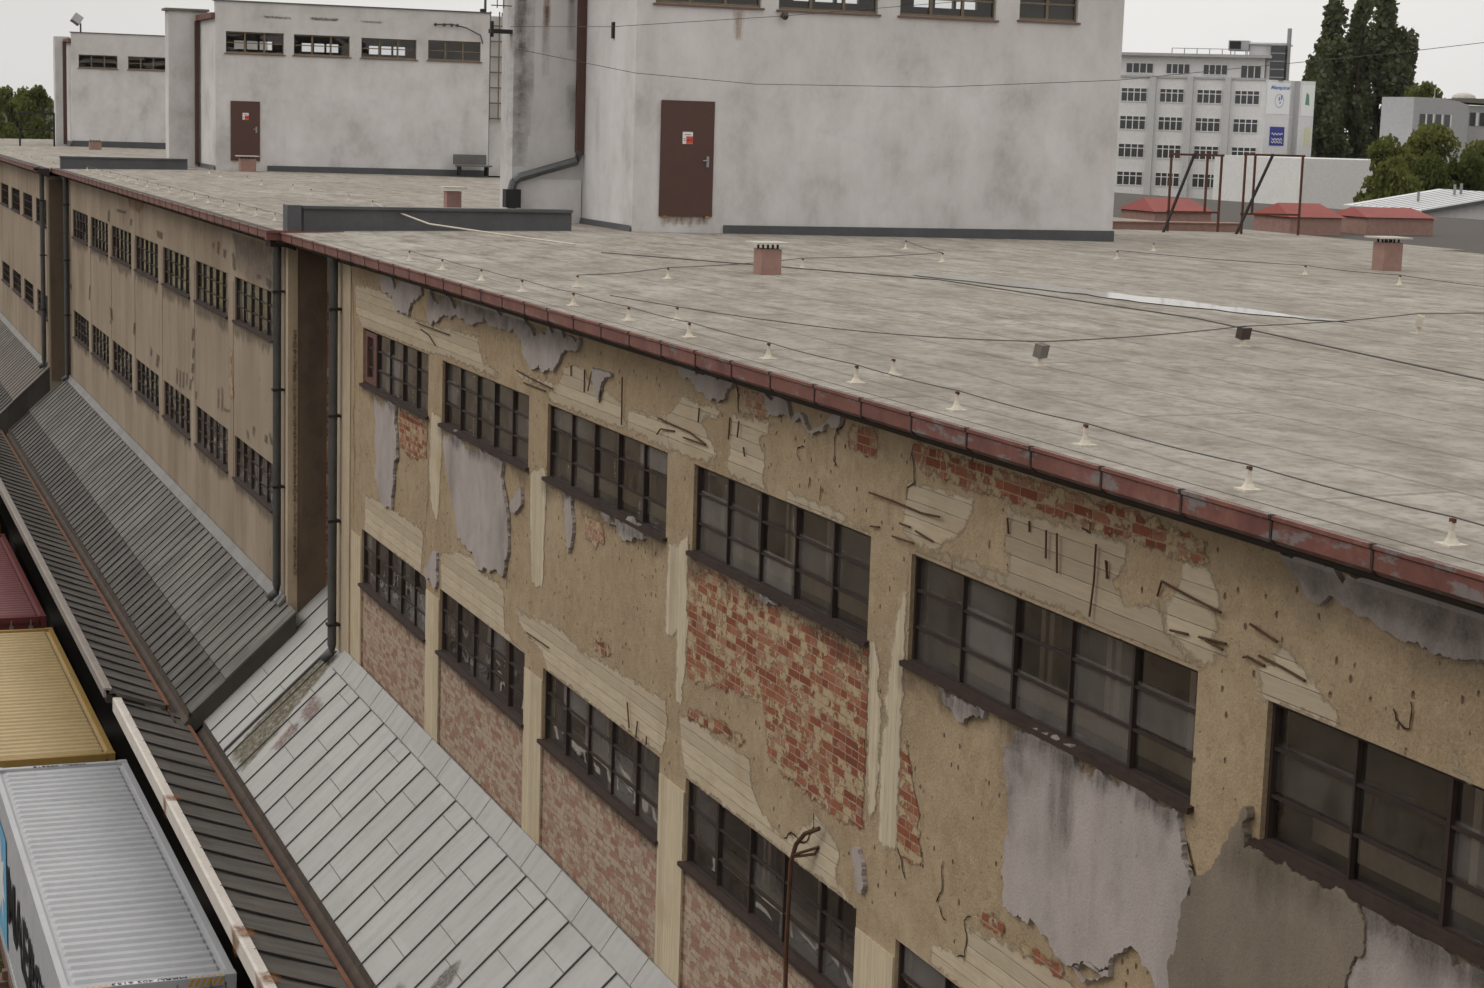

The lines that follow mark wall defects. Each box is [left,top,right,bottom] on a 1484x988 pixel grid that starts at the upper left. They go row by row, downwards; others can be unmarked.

spalling [355,274,878,491]
spalling [364,396,923,908]
spalling [1258,647,1338,727]
peeling [1279,552,1484,663]
peeling [928,728,1194,988]
peeling [1347,906,1484,988]